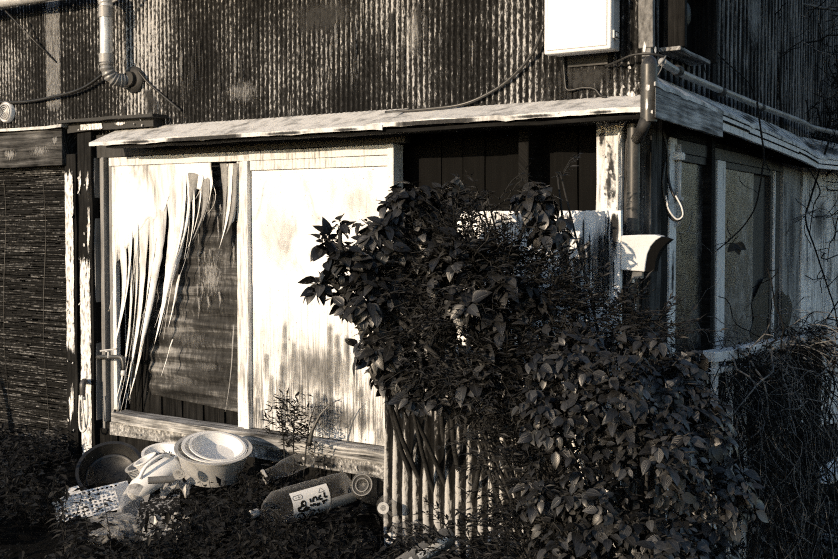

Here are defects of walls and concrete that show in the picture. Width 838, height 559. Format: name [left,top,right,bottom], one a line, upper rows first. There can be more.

leakage [264,323,366,434]